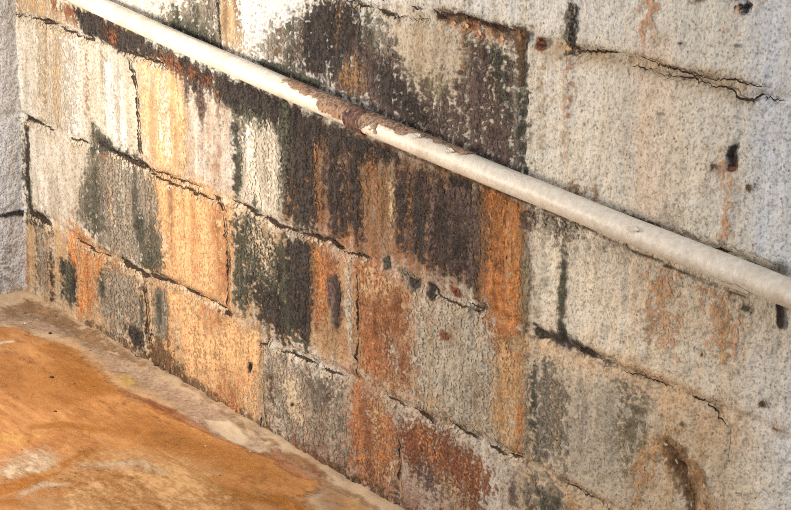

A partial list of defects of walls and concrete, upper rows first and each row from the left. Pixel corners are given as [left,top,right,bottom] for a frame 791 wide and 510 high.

corrosion [638,0,667,57]
crack [577,49,786,111]
water stain [0,0,531,510]
corrosion [59,56,498,510]
corrosion [478,184,528,463]